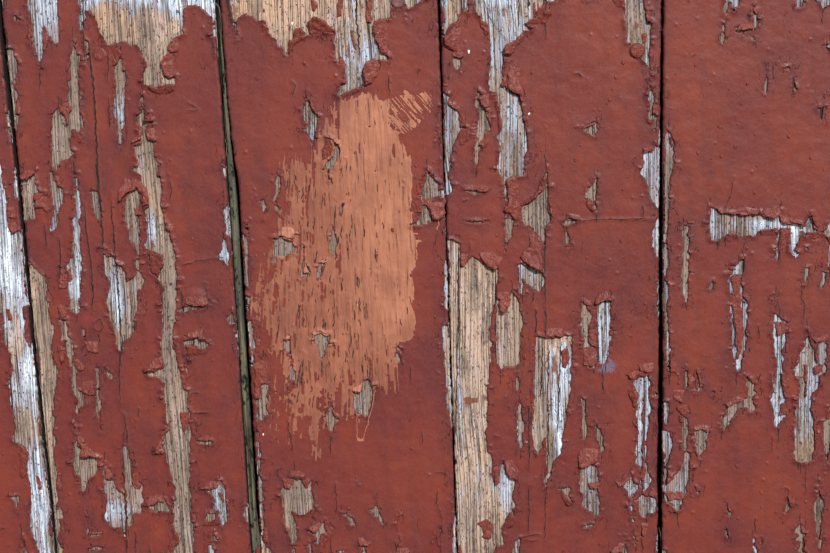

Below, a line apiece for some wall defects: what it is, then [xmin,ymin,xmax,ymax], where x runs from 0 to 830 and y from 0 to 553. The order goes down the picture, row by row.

peeling [302,90,320,140]
peeling [229,0,394,106]
peeling [0,0,228,553]
peeling [218,202,231,265]
peeling [248,320,271,553]
peeling [271,227,305,262]
peeling [279,462,345,553]
peeling [352,369,377,422]
peeling [410,0,616,553]
peeling [610,90,709,553]
peeling [705,198,830,440]
peeling [771,310,830,474]